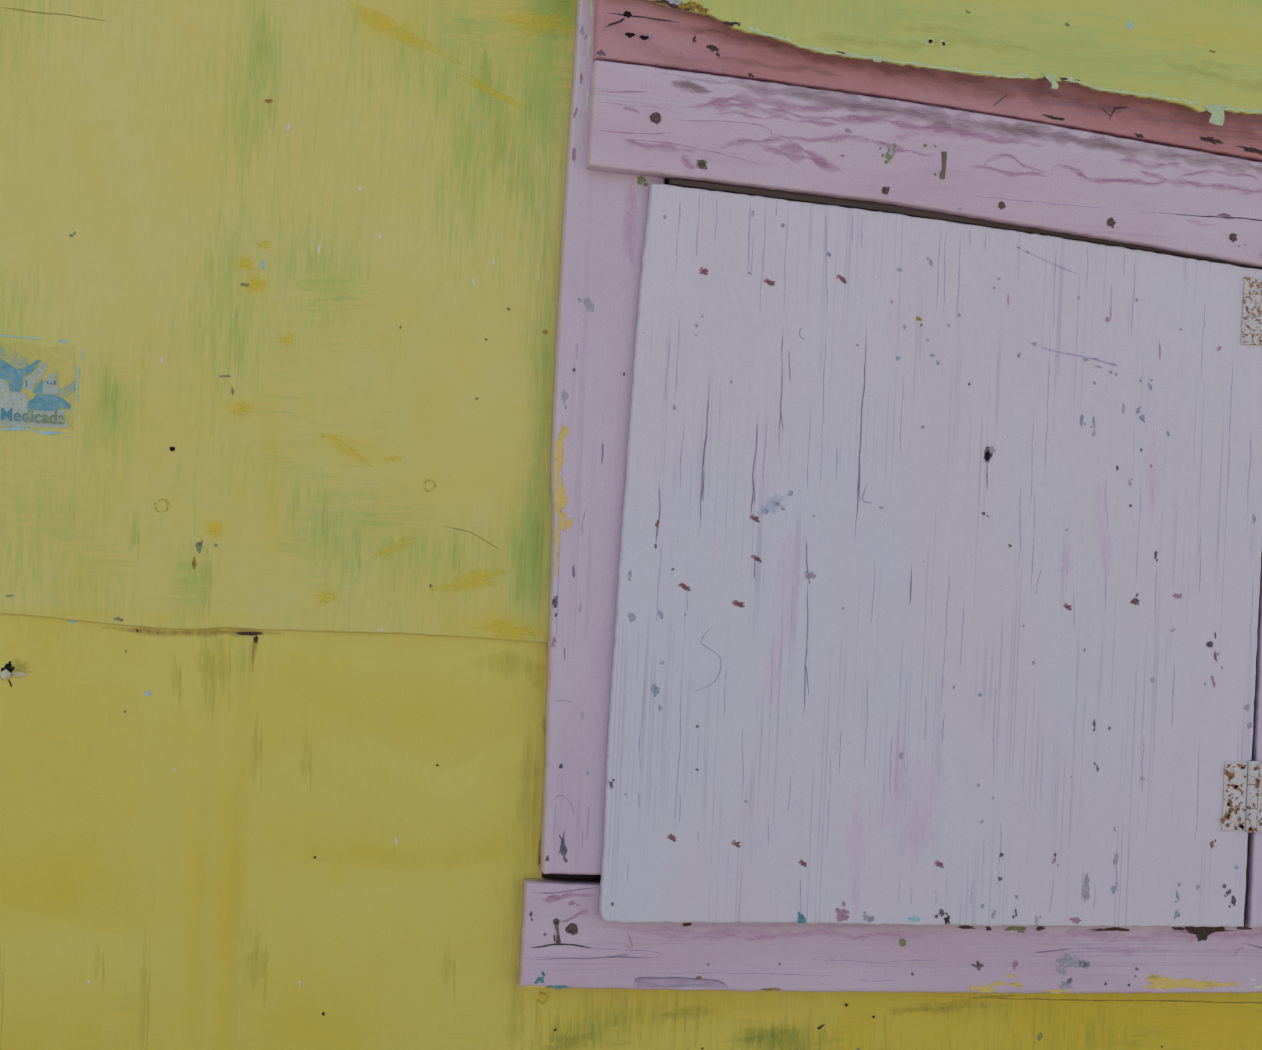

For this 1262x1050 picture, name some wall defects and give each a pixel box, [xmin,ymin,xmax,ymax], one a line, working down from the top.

peeling [654,0,709,14]
peeling [625,33,653,42]
peeling [0,669,27,680]
rust [1220,764,1262,833]